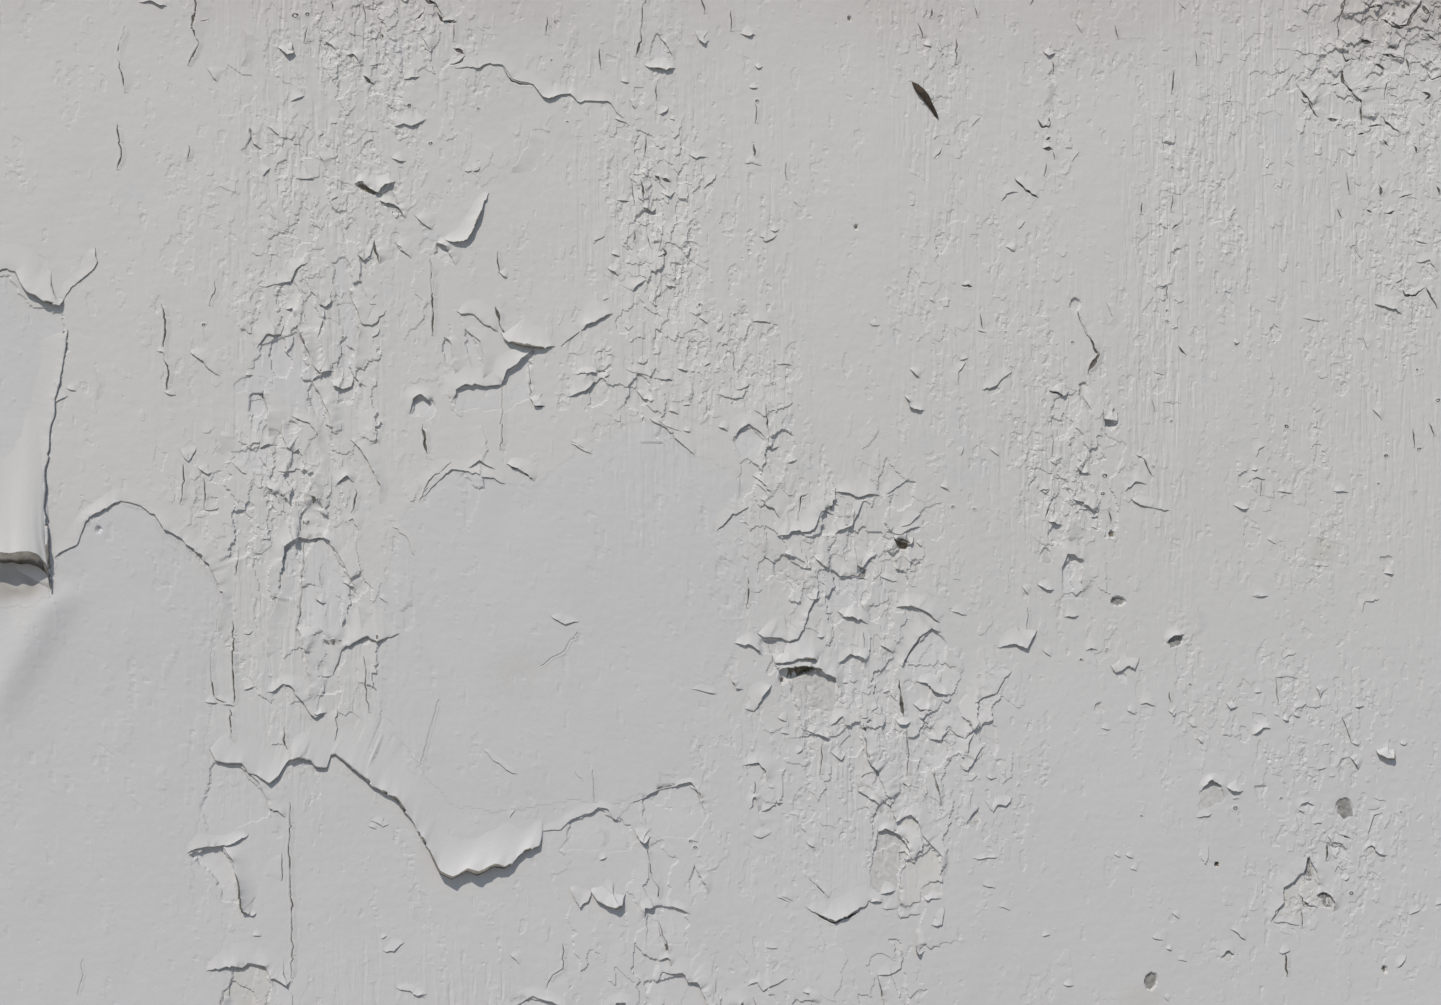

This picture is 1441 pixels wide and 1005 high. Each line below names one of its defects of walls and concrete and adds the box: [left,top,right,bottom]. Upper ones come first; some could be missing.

peeling [277,1,426,179]
peeling [1168,69,1178,112]
peeling [1104,404,1118,429]
peeling [0,136,1012,1005]
peeling [997,450,1170,656]
peeling [1077,637,1140,682]
crack [806,885,878,926]
crack [875,928,928,1005]